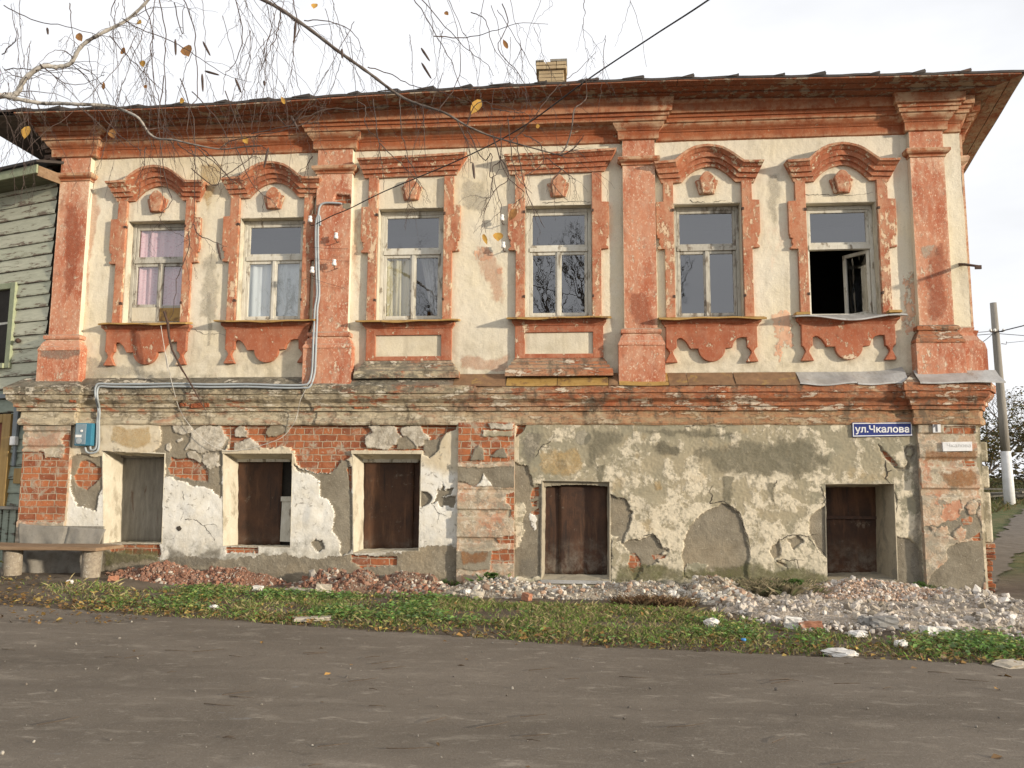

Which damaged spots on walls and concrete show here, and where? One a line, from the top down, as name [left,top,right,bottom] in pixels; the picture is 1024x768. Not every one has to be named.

peeling [901,271,916,335]
flaking render [944,426,975,435]
flaking render [18,433,102,524]
flaking render [153,422,541,579]
flaking render [611,495,669,583]
flaking render [682,504,750,579]
flaking render [770,506,826,570]
flaking render [896,498,986,591]